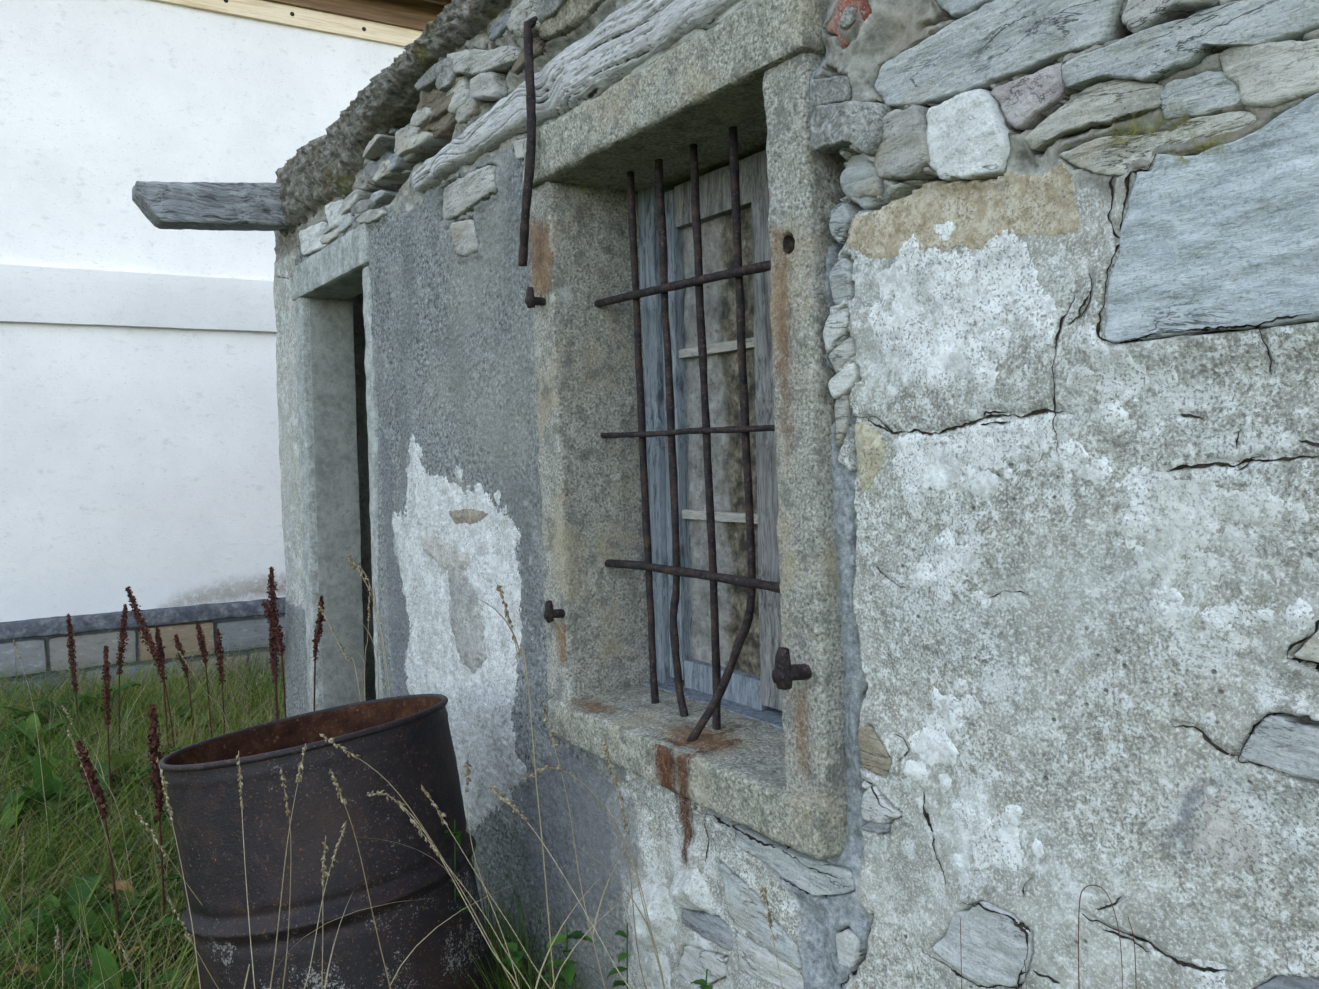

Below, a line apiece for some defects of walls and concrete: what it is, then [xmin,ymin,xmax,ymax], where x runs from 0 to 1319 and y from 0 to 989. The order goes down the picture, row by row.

rust [530,222,554,297]
crack [857,154,1312,451]
crack [1167,431,1319,472]
flaking render [391,434,527,831]
rust [653,720,755,864]